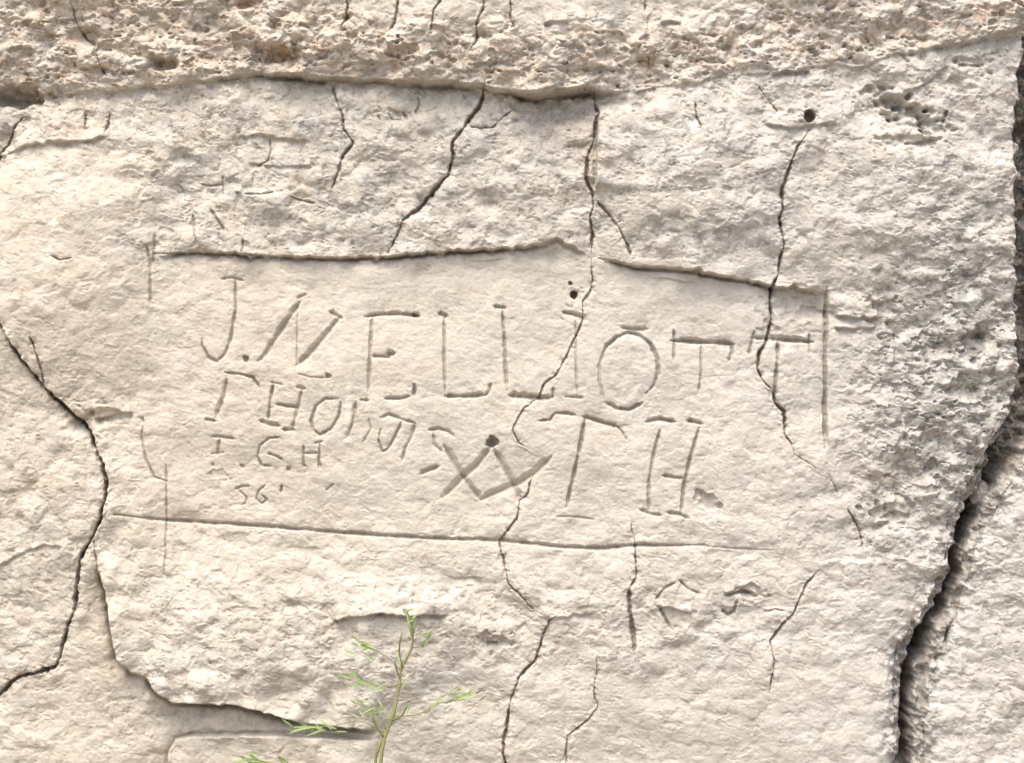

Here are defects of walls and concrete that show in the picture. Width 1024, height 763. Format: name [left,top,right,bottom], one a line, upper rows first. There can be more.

crack [0,320,110,698]
crack [330,83,355,192]
crack [387,79,513,254]
crack [498,90,633,763]
crack [626,523,638,656]
crack [768,570,819,694]
crack [756,129,865,551]
crack [892,29,1024,763]